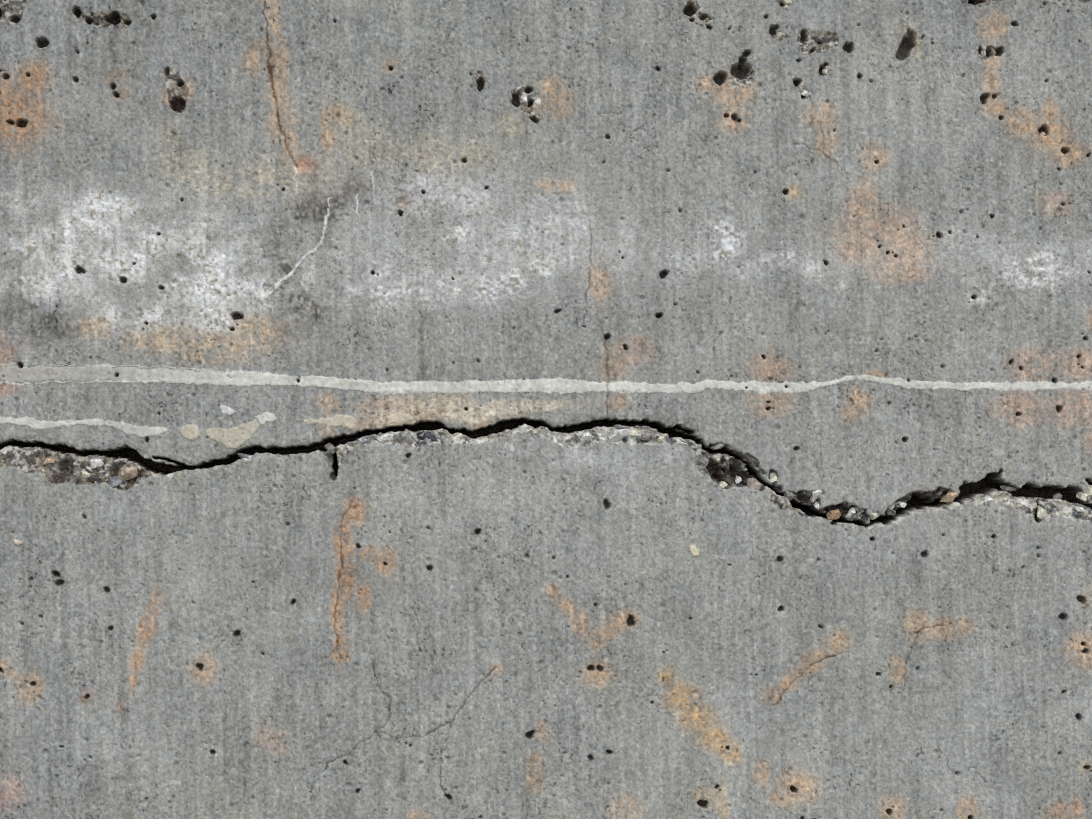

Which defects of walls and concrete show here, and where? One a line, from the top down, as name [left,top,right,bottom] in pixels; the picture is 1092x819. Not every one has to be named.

rust [0,49,80,170]
rust [238,0,319,176]
rust [972,4,1092,221]
water stain [0,103,1092,429]
crack [583,225,592,322]
rust [814,135,952,290]
water stain [0,404,277,448]
crack [0,341,1092,530]
water stain [479,434,690,483]
crack [334,554,344,650]
rust [539,576,646,694]
rust [649,662,830,819]